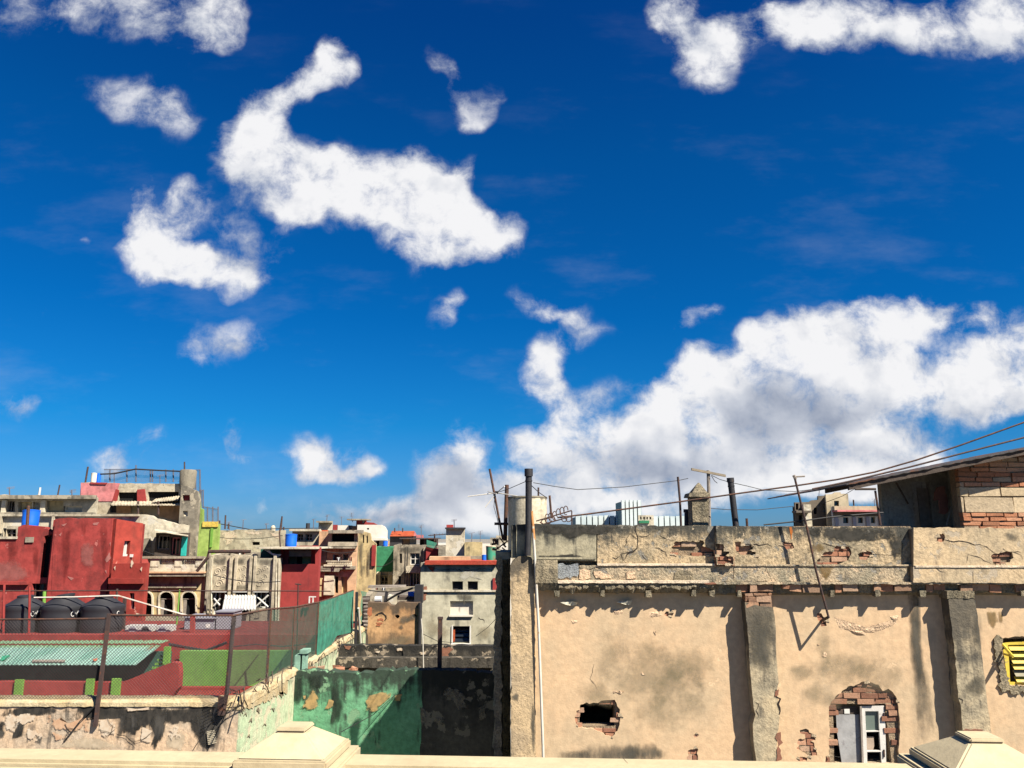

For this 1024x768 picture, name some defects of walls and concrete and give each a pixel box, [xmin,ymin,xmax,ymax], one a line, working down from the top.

crack [578,527,691,577]
flaking render [670,540,759,566]
flaking render [817,546,874,564]
crack [948,540,1023,576]
flaking render [991,551,1012,566]
peeling [3,714,115,741]
peeling [141,727,152,742]
damp [294,676,343,723]
flaking render [303,691,334,710]
flaking render [366,692,402,712]
spalling [575,690,624,738]
flaking render [796,680,900,763]